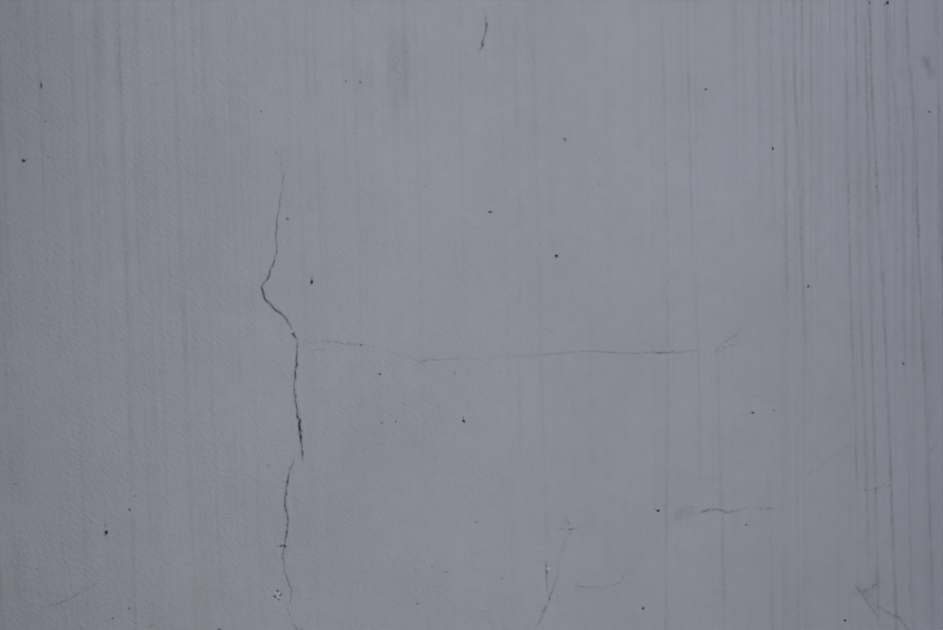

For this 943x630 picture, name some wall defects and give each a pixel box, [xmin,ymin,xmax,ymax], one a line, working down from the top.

crack [261,262,306,446]
crack [272,481,293,551]